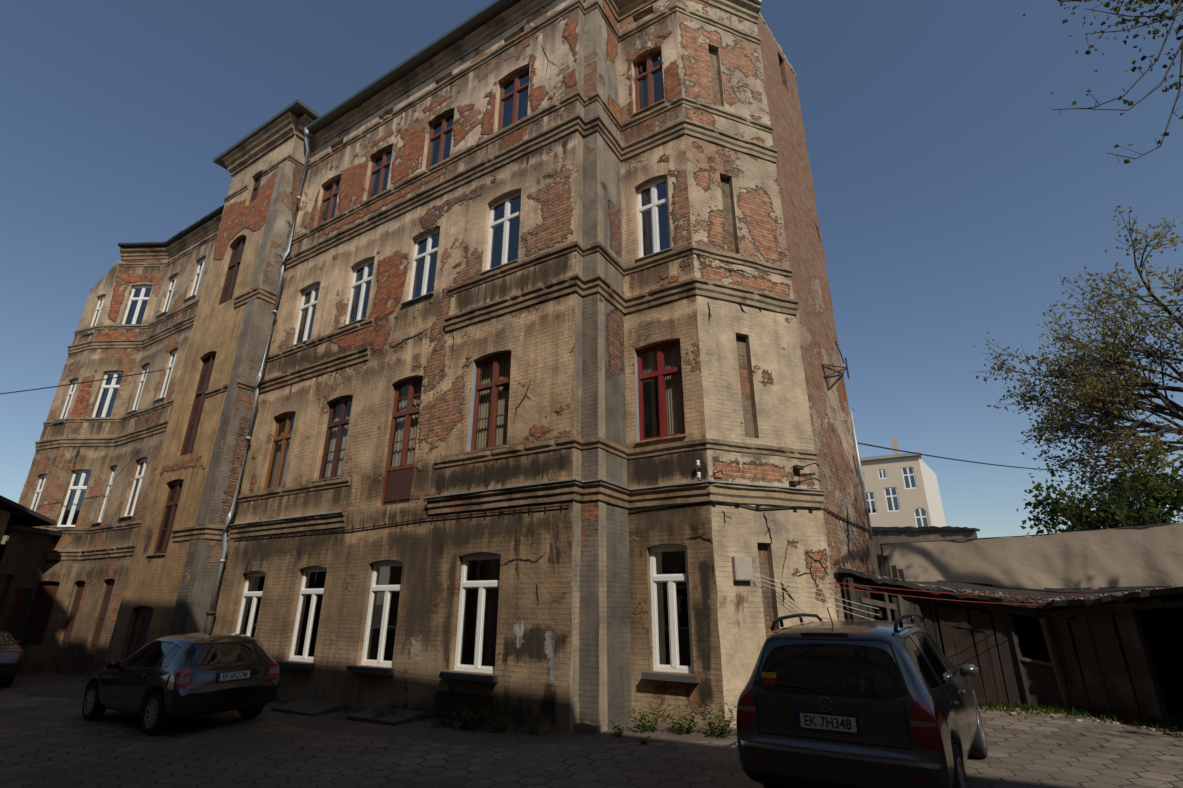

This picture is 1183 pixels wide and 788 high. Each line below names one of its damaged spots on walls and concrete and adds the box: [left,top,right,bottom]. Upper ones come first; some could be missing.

spalling [557,13,578,88]
spalling [599,0,769,129]
spalling [209,169,278,265]
spalling [278,81,498,272]
spalling [520,168,574,257]
spalling [649,141,791,298]
spalling [306,251,409,364]
spalling [411,242,487,456]
damp [435,453,568,495]
spalling [710,456,815,487]
spalling [787,538,829,605]
damp [487,622,566,728]